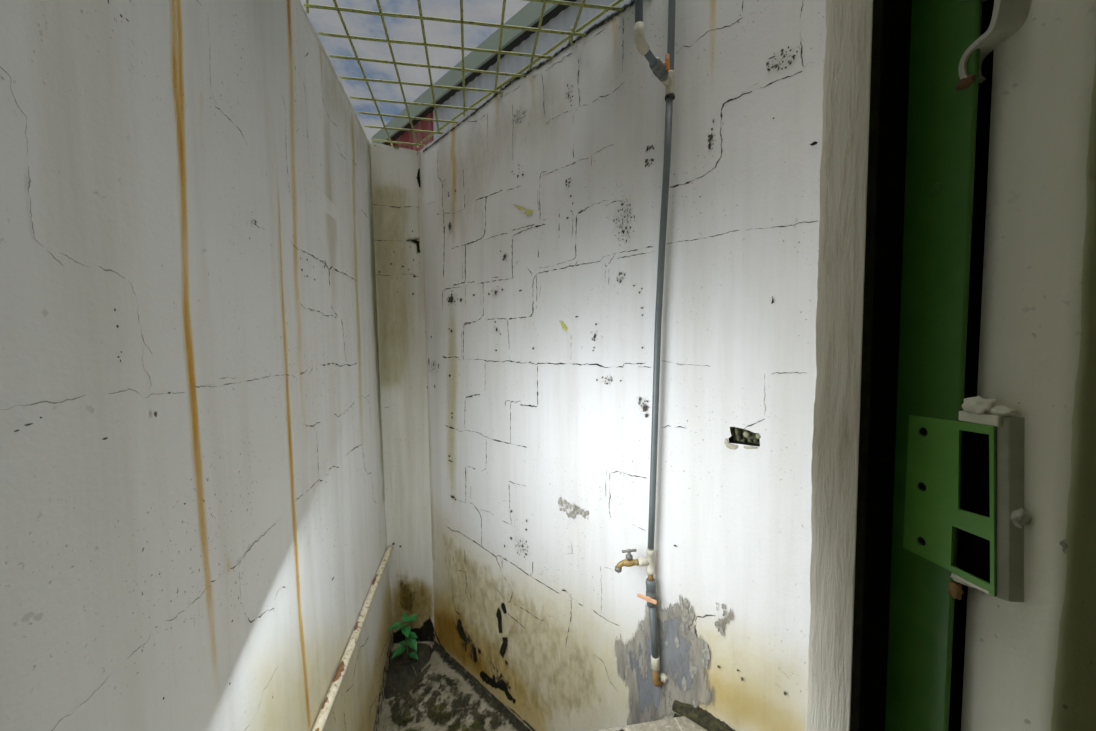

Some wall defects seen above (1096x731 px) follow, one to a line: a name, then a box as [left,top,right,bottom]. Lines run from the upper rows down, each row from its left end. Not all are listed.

crack [468,28,624,160]
crack [669,2,812,188]
crack [0,145,817,655]
spalling [724,427,761,450]
water stain [455,603,535,731]
peeling [614,595,714,725]